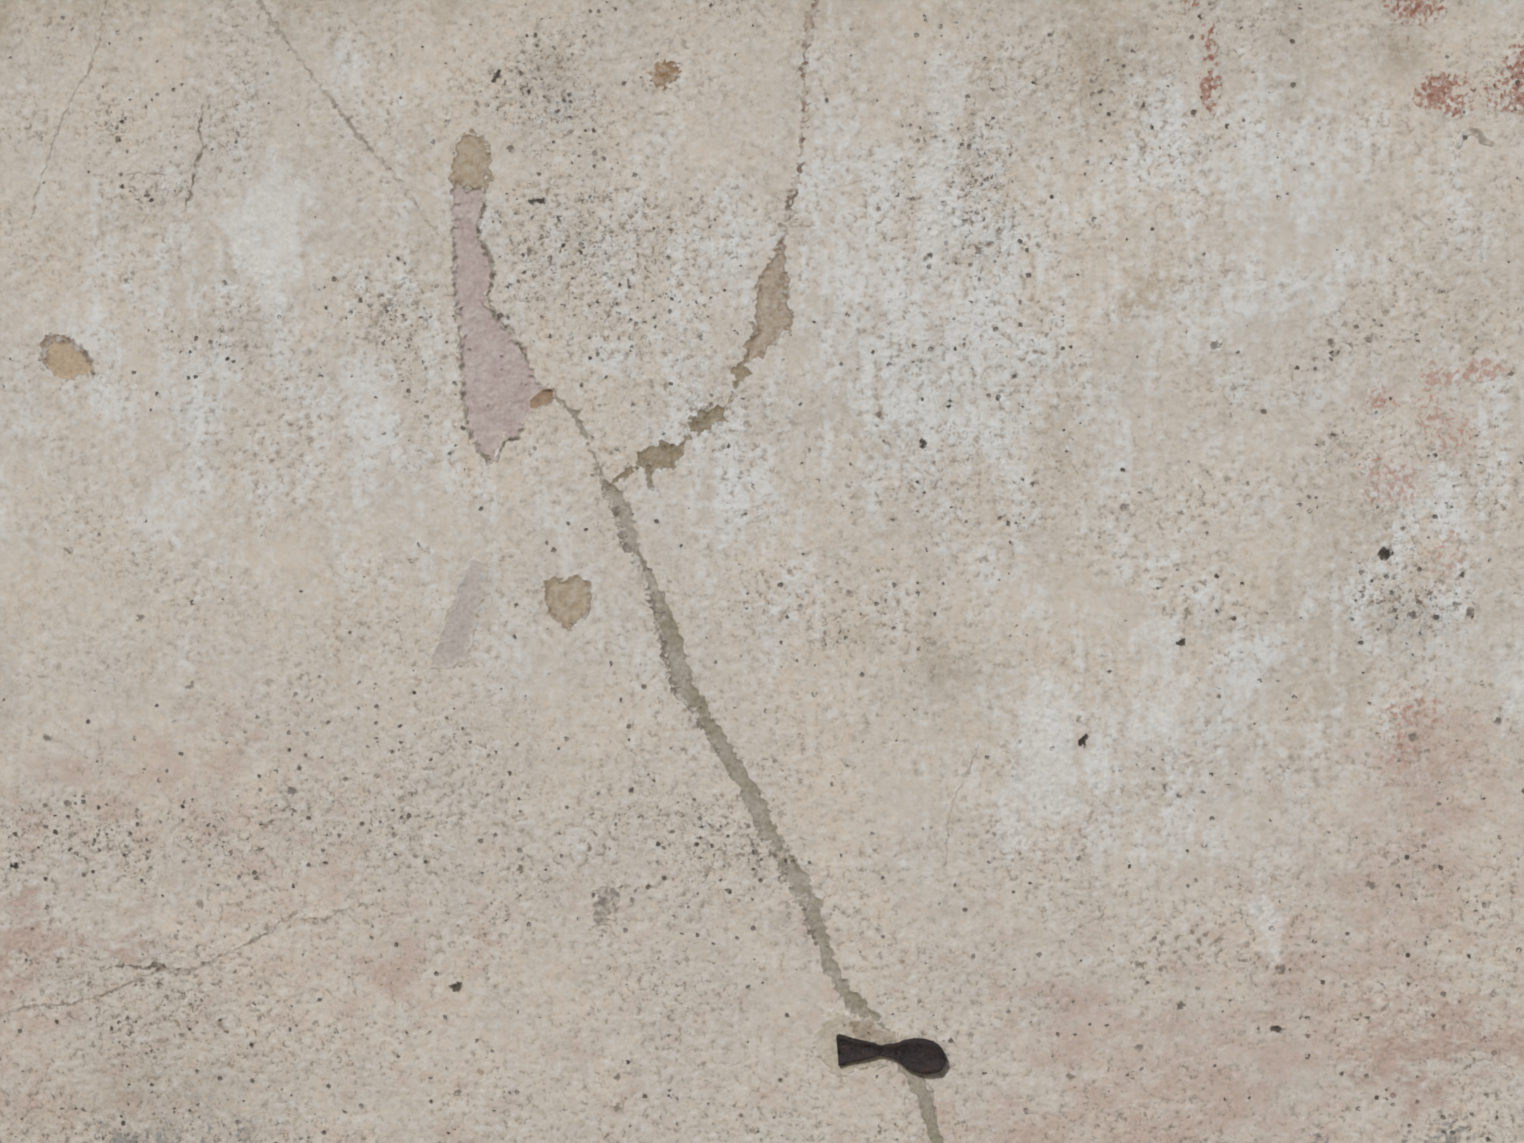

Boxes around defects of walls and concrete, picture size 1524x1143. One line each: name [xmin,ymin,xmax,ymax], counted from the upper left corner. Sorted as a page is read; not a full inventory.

crack [29,0,108,219]
crack [126,102,205,212]
crack [255,0,446,242]
crack [775,0,821,255]
corrosion [1180,0,1223,120]
corrosion [1377,0,1448,27]
corrosion [1411,33,1524,124]
crack [360,270,411,341]
peeling [449,185,557,466]
spalling [742,246,795,363]
crack [553,332,945,1143]
crack [0,901,374,1018]